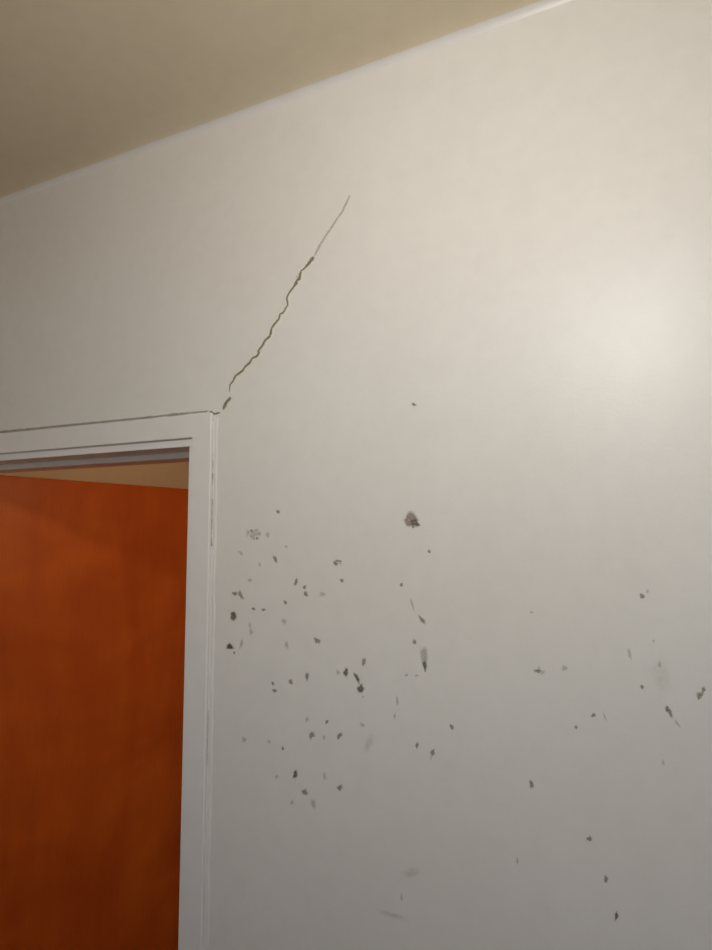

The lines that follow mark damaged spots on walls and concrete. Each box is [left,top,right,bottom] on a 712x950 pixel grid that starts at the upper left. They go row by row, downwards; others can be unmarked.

crack [0,255,316,433]
spalling [405,513,420,528]